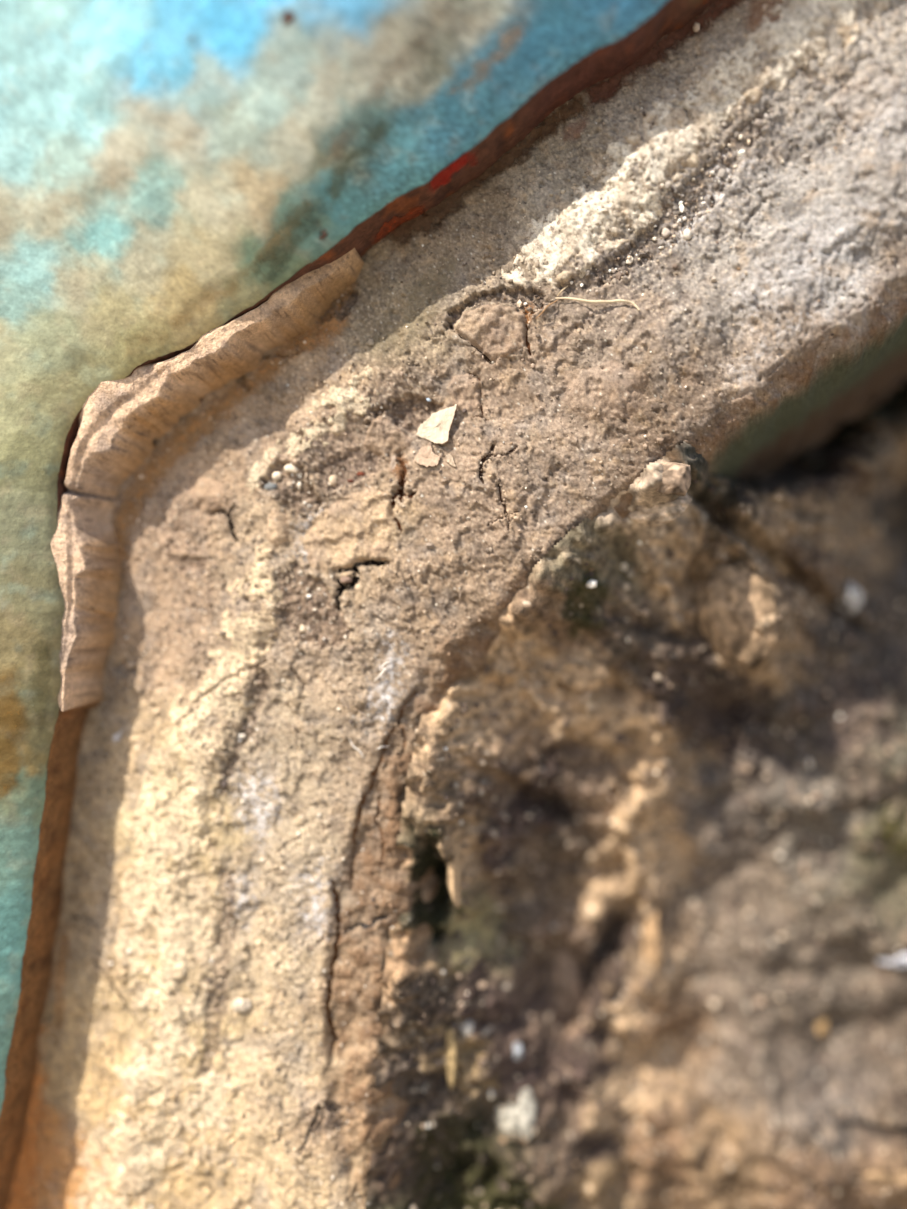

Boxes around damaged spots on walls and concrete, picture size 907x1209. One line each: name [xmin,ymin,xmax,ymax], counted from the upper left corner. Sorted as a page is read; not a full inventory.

corrosion [387,0,783,244]
crack [525,306,543,355]
crack [452,329,520,530]
crack [212,504,238,542]
crack [390,455,416,532]
crack [334,559,387,610]
crack [317,692,417,1055]